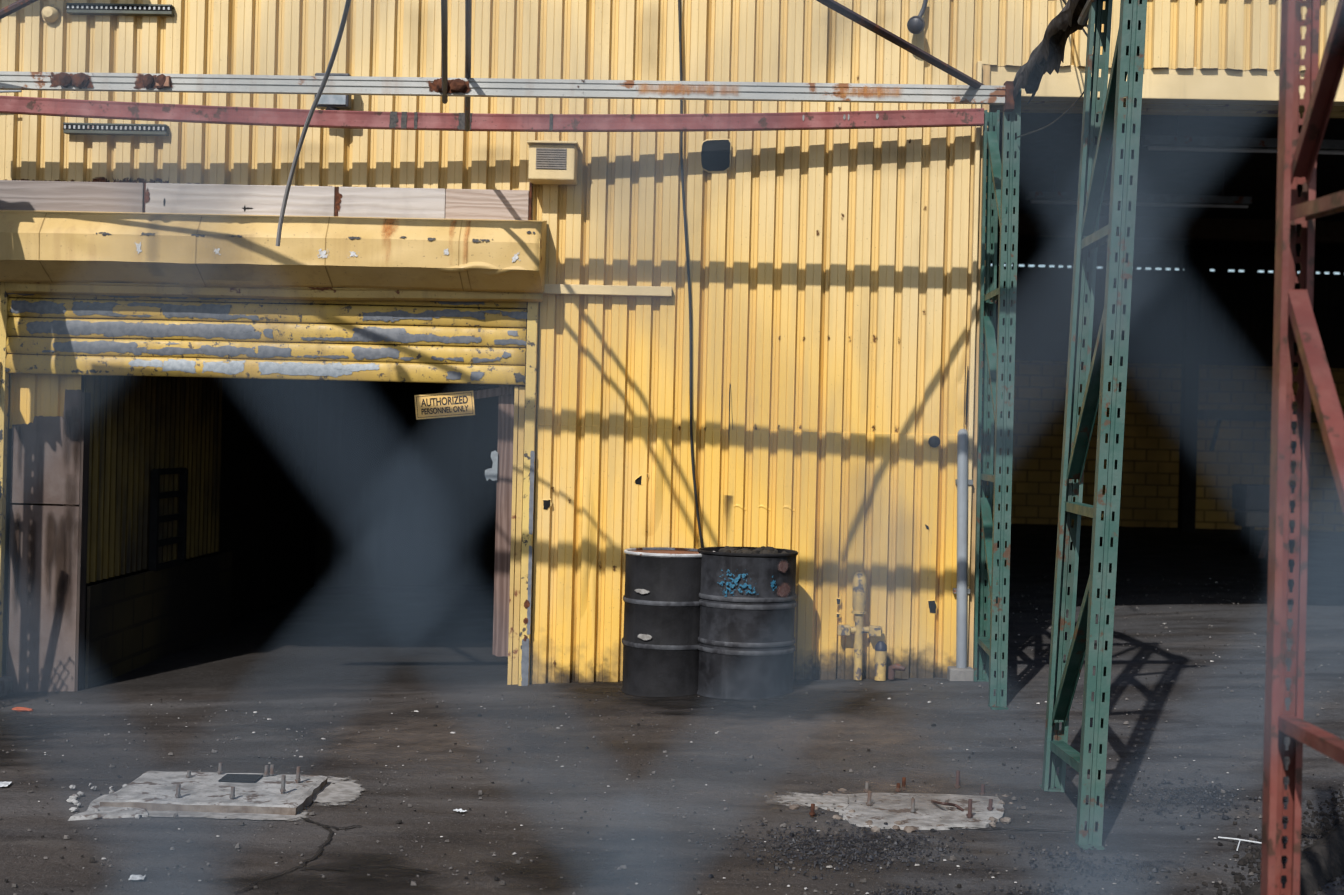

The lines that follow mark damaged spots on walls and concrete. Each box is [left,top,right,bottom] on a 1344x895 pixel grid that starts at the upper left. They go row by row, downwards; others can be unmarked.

corrosion [50,72,91,89]
corrosion [133,74,174,89]
peeling [8,293,114,353]
peeling [80,296,275,375]
peeling [283,301,527,382]
water stain [13,484,79,603]
crack [234,818,437,893]